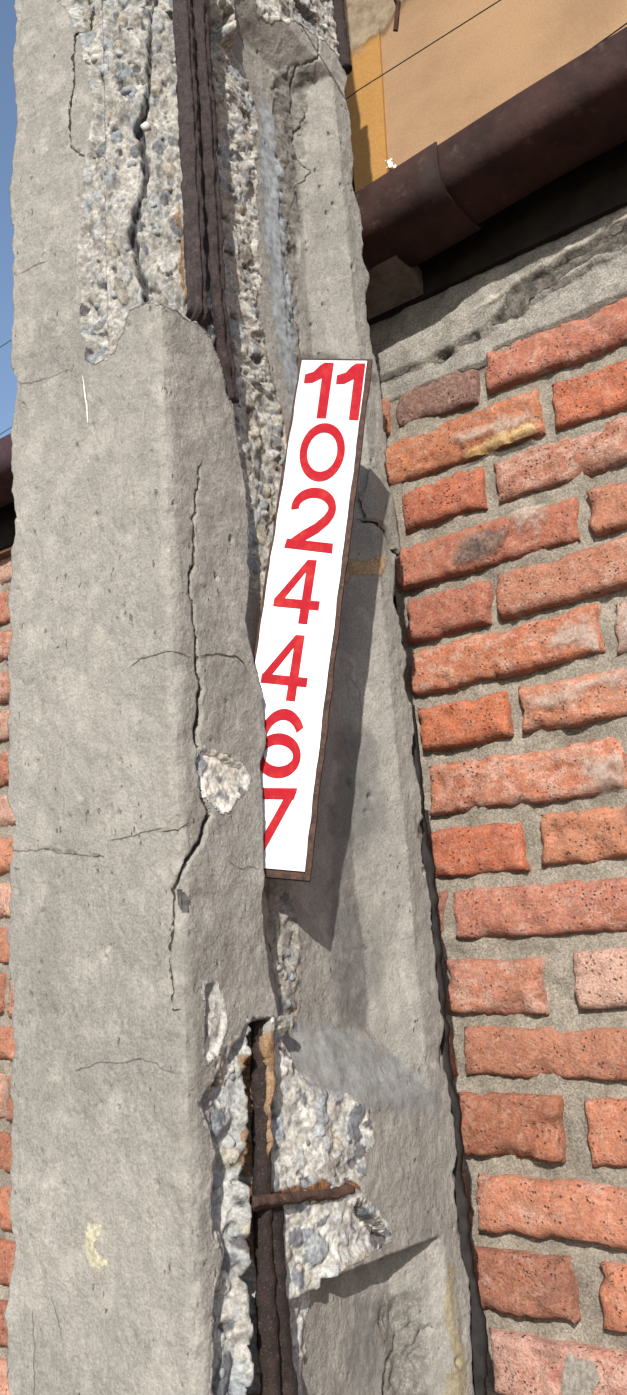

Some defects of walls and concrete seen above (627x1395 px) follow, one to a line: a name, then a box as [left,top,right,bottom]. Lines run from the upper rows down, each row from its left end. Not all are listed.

crack [68,1,159,303]
spalling [254,0,348,78]
spalling [56,0,287,601]
crack [128,461,246,748]
crack [13,787,210,1011]
rust [239,1031,276,1257]
spalling [198,879,393,1395]
rust [271,1178,361,1203]